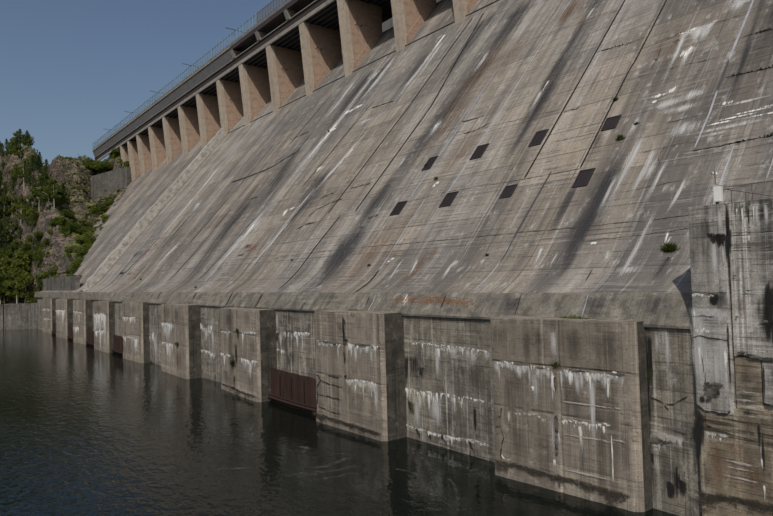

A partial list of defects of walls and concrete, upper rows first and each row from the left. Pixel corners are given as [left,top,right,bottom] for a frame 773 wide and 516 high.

damp [692,200,773,383]
damp [94,313,106,344]
damp [152,323,173,361]
damp [200,324,257,378]
damp [413,342,489,372]
crack [314,374,342,414]
damp [346,379,377,404]
damp [404,358,488,451]
damp [492,361,628,507]